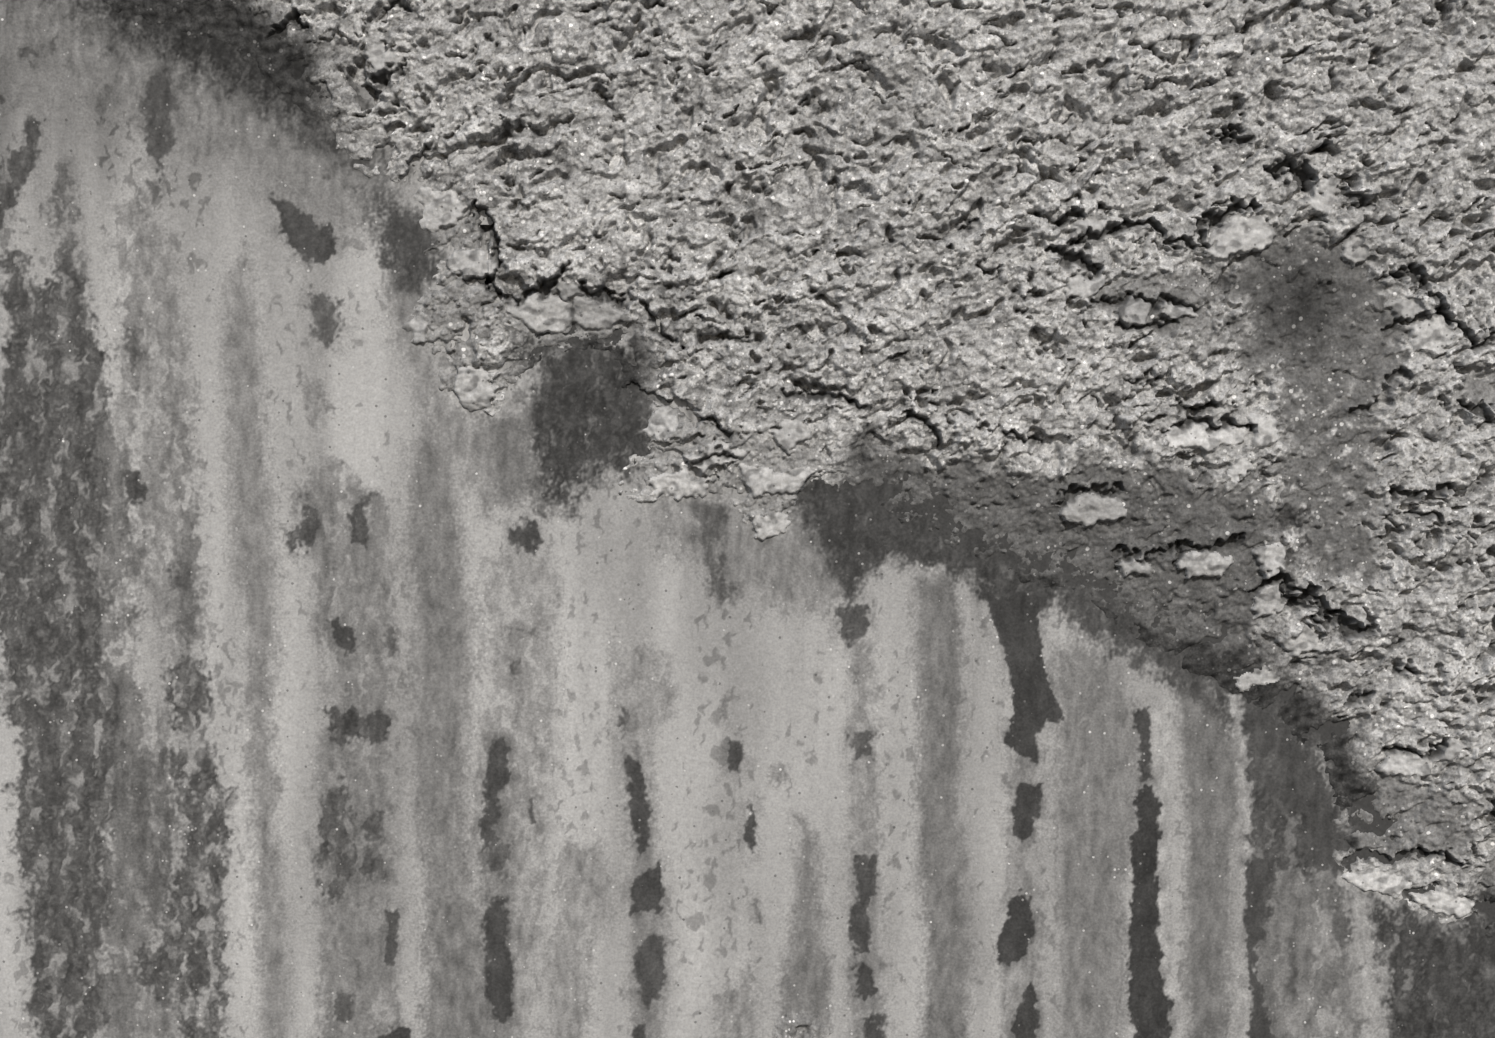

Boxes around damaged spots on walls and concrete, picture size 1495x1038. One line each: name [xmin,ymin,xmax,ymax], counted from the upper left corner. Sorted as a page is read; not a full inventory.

damp [0,0,689,1038]
damp [626,459,1495,1038]